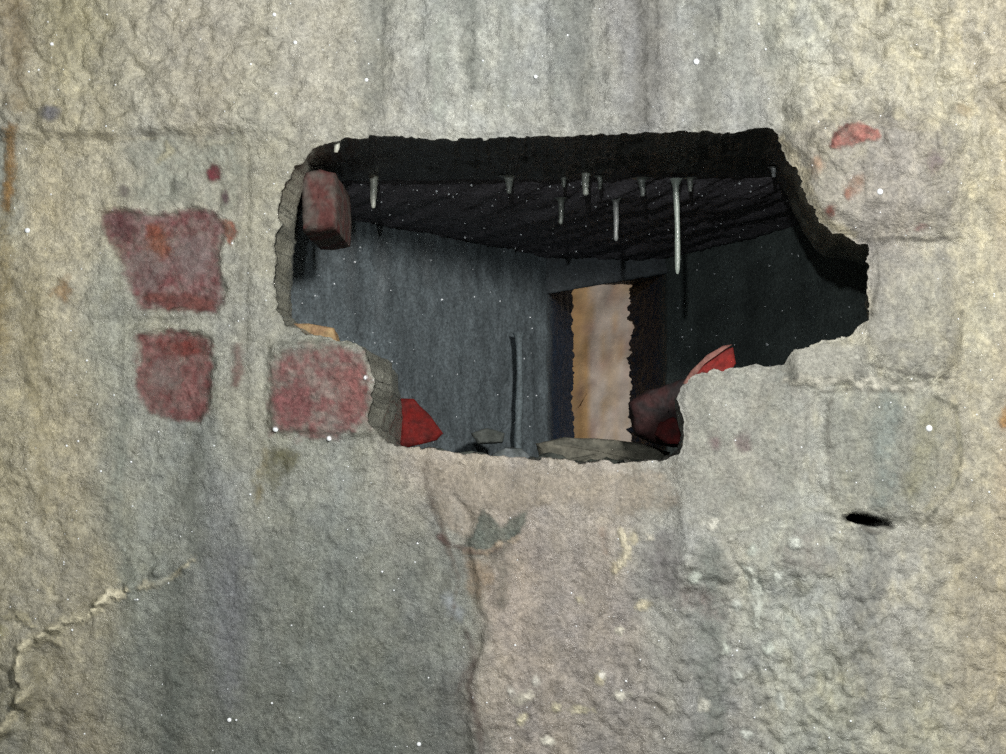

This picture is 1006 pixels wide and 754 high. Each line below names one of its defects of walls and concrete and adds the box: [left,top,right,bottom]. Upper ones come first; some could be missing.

spalling [830,123,881,148]
peeling [104,134,243,312]
spalling [302,169,351,250]
peeling [137,330,213,421]
spalling [269,346,371,438]
spalling [628,379,685,448]